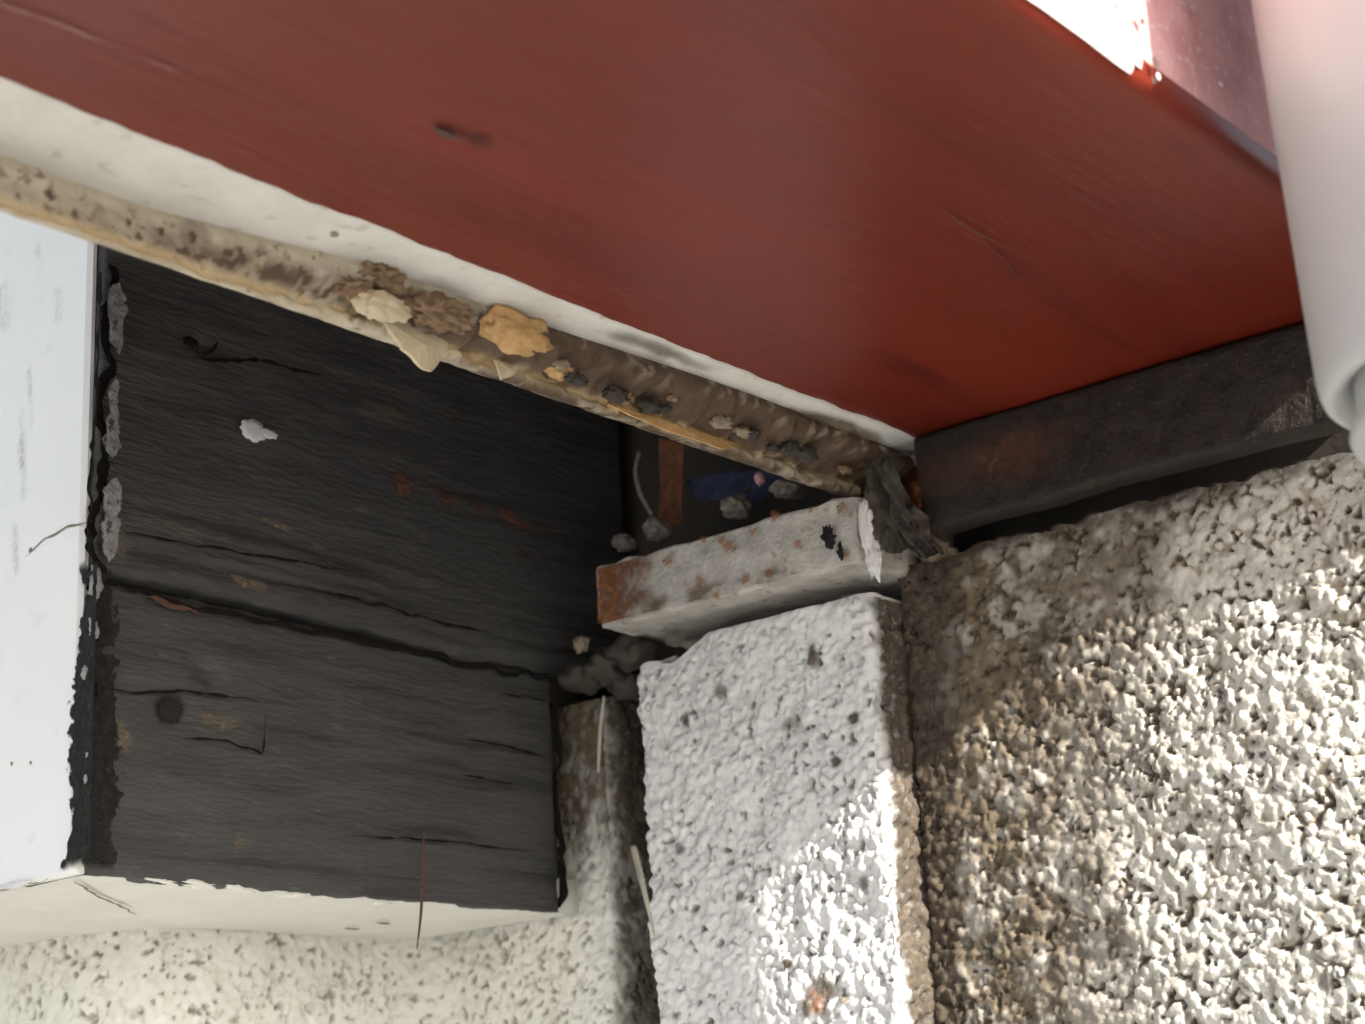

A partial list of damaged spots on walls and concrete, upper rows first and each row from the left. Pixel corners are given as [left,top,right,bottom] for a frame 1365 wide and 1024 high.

peeling [381,322,449,372]
peeling [493,360,517,380]
peeling [600,395,740,450]
crack [25,522,86,557]
peeling [820,502,848,561]
rust [596,557,671,625]
rust [689,576,721,602]
crack [86,532,558,701]
crack [452,737,547,758]
leakage [875,464,1291,1024]
crack [345,834,532,852]